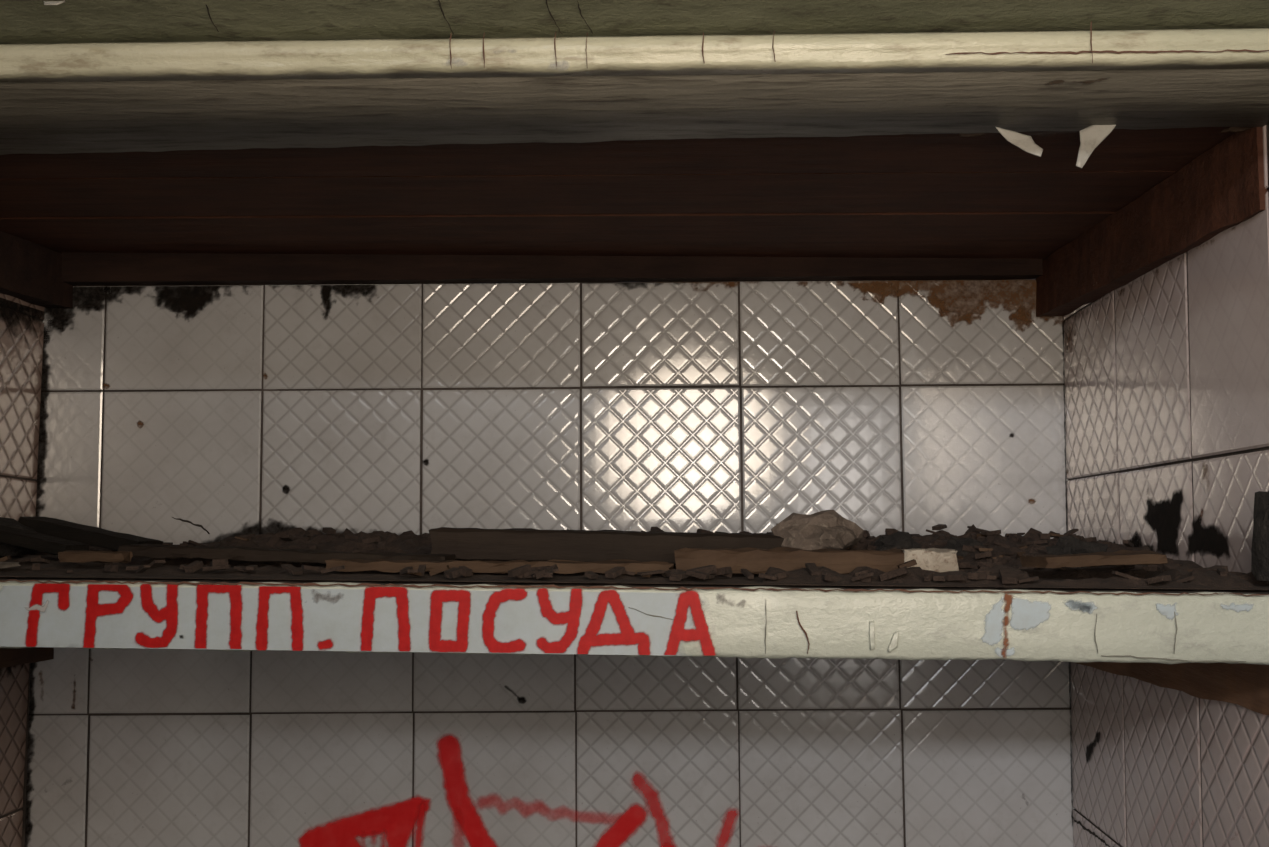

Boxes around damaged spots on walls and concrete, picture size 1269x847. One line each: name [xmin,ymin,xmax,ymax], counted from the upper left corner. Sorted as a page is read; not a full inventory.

crack [546,0,593,67]
peeling [995,125,1116,169]